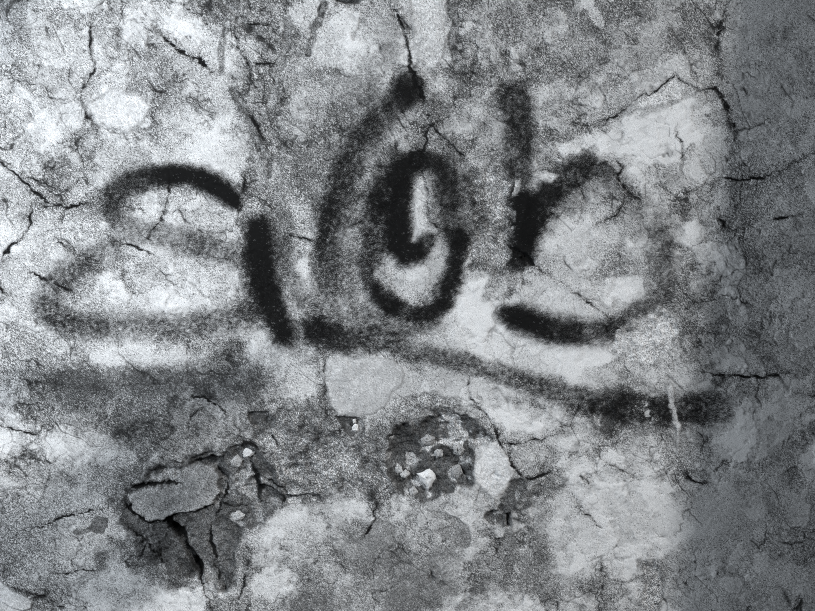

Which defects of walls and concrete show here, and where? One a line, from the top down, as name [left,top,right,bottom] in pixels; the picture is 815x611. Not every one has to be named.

crack [80,23,96,124]
crack [161,34,210,71]
crack [232,23,271,71]
crack [236,91,272,179]
crack [389,1,467,196]
crack [603,36,736,139]
crack [712,10,726,55]
crack [0,161,88,260]
crack [29,271,75,293]
crack [119,243,151,254]
flaking render [118,355,568,593]
flaking render [73,516,108,536]